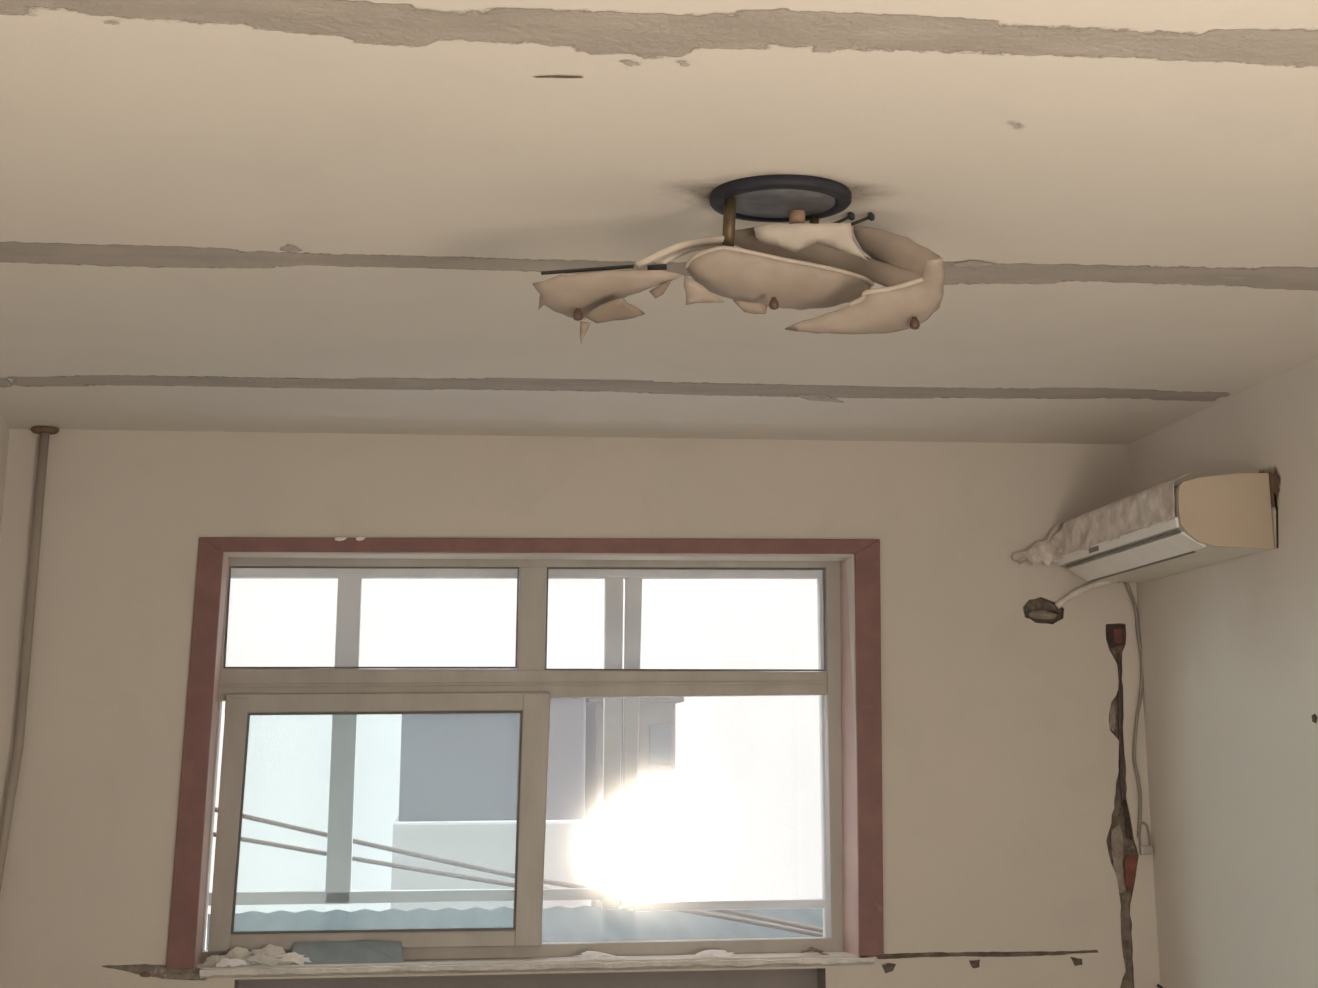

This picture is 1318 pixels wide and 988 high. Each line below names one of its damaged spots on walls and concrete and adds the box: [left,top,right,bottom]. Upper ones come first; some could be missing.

peeling [0,0,1318,68]
peeling [0,242,691,276]
peeling [942,260,1318,290]
peeling [0,375,1229,403]
spalling [1106,625,1125,648]